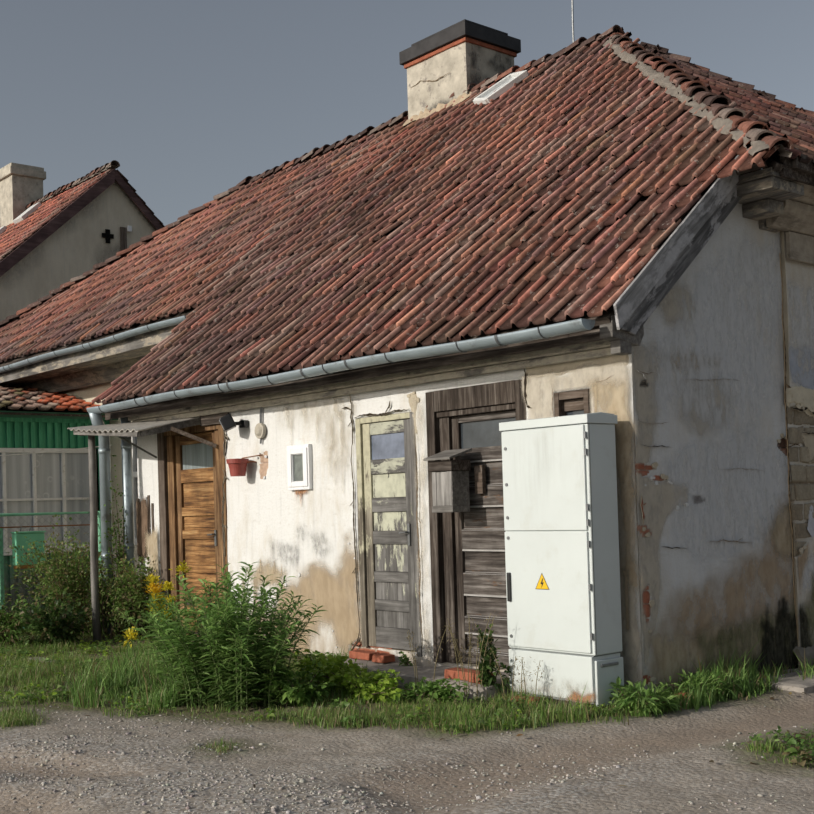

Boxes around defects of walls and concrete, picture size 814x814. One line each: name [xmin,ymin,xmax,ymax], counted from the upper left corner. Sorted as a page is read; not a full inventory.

spalling [256,451,268,479]
water stain [243,560,282,588]
peeling [522,345,706,696]
water stain [652,505,811,690]
spalling [777,385,814,561]